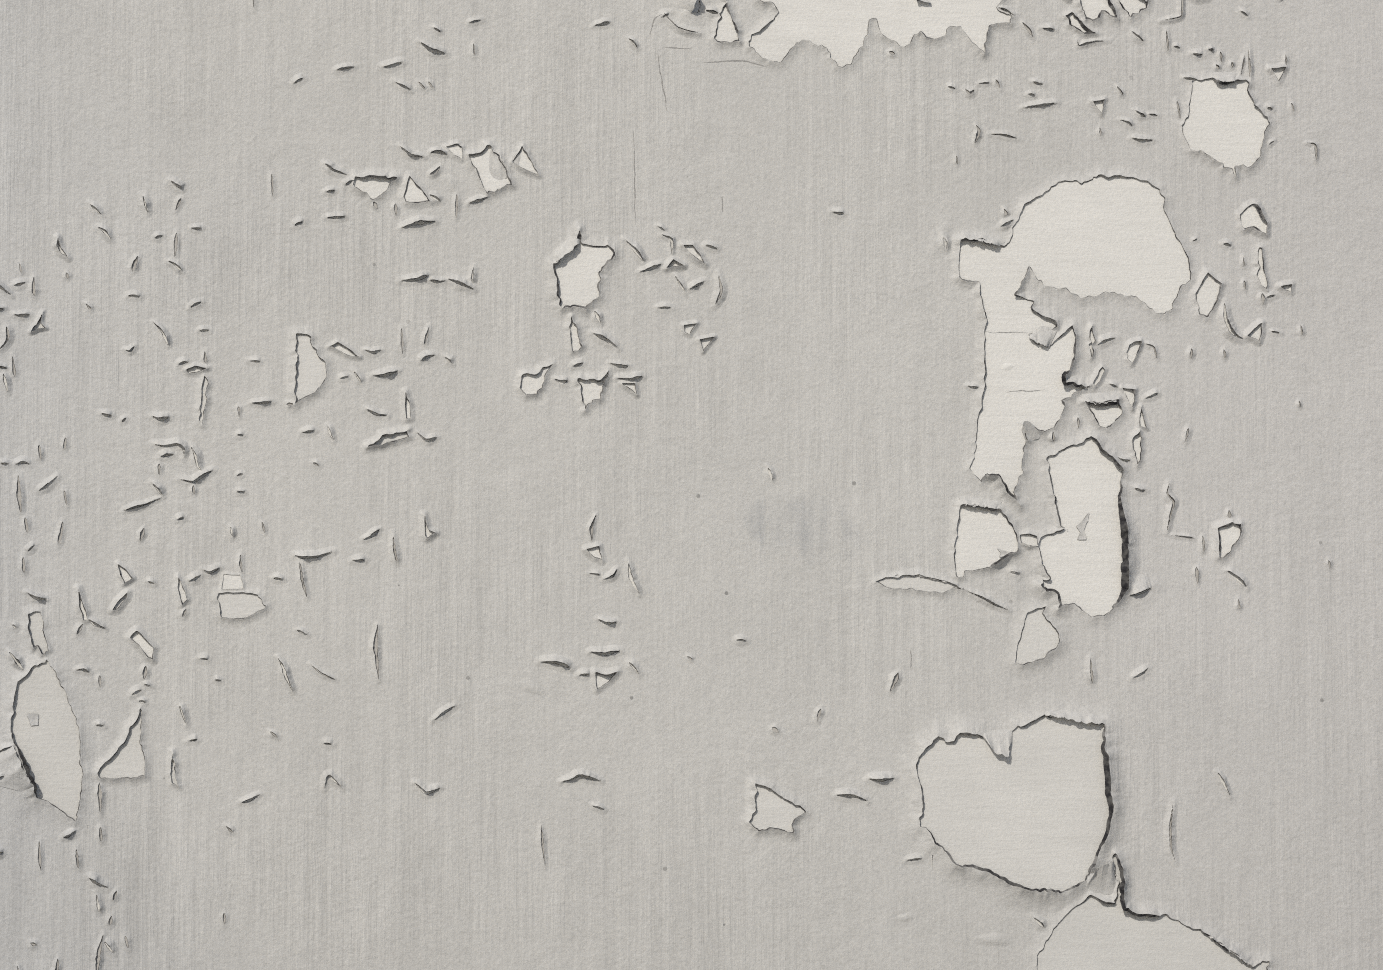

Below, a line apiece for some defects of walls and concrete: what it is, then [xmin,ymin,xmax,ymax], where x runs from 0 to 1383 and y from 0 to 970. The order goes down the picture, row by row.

peeling [656,0,1021,78]
peeling [1036,0,1187,47]
peeling [288,137,544,234]
peeling [395,262,480,296]
peeling [511,218,722,419]
peeling [146,317,219,525]
peeling [244,324,457,455]
peeling [268,524,384,585]
peeling [830,42,1297,970]
peeling [0,559,252,843]
peeling [534,614,645,696]
peeling [738,773,816,844]